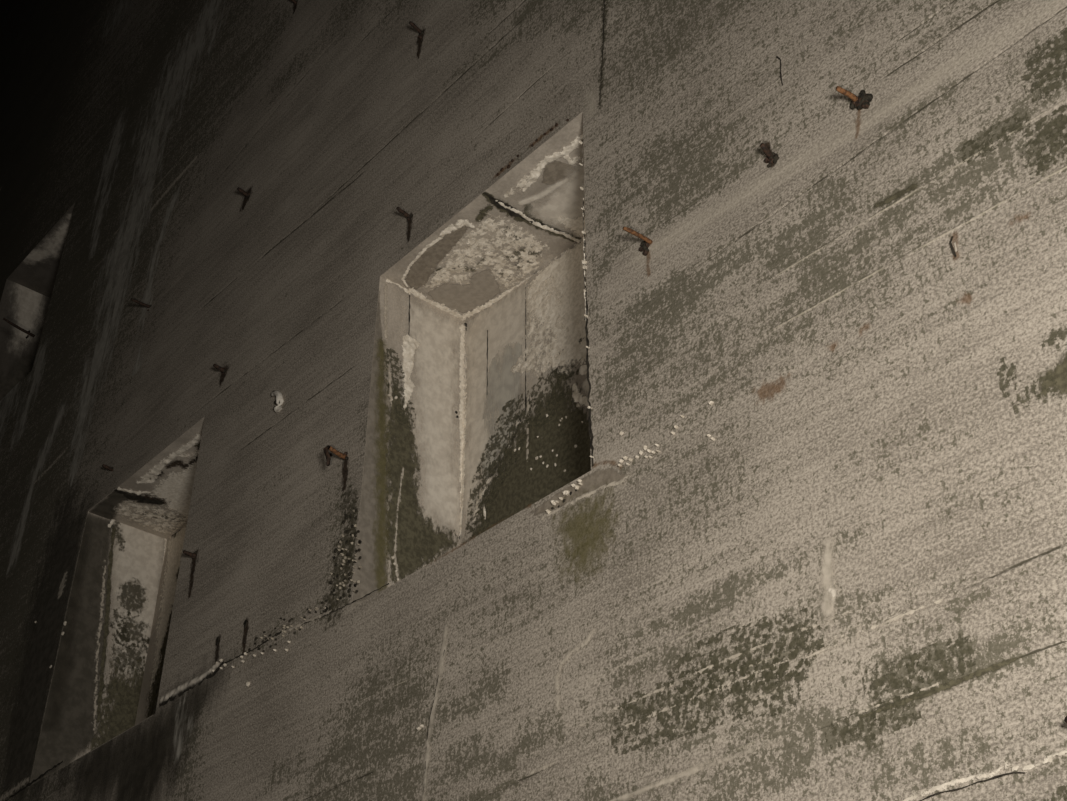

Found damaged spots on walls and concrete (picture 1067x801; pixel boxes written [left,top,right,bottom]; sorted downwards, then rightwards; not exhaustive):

crack [598,0,608,109]
damp [384,134,588,536]
damp [91,434,201,730]
damp [391,467,404,581]
damp [65,674,216,801]
crack [903,750,1067,801]